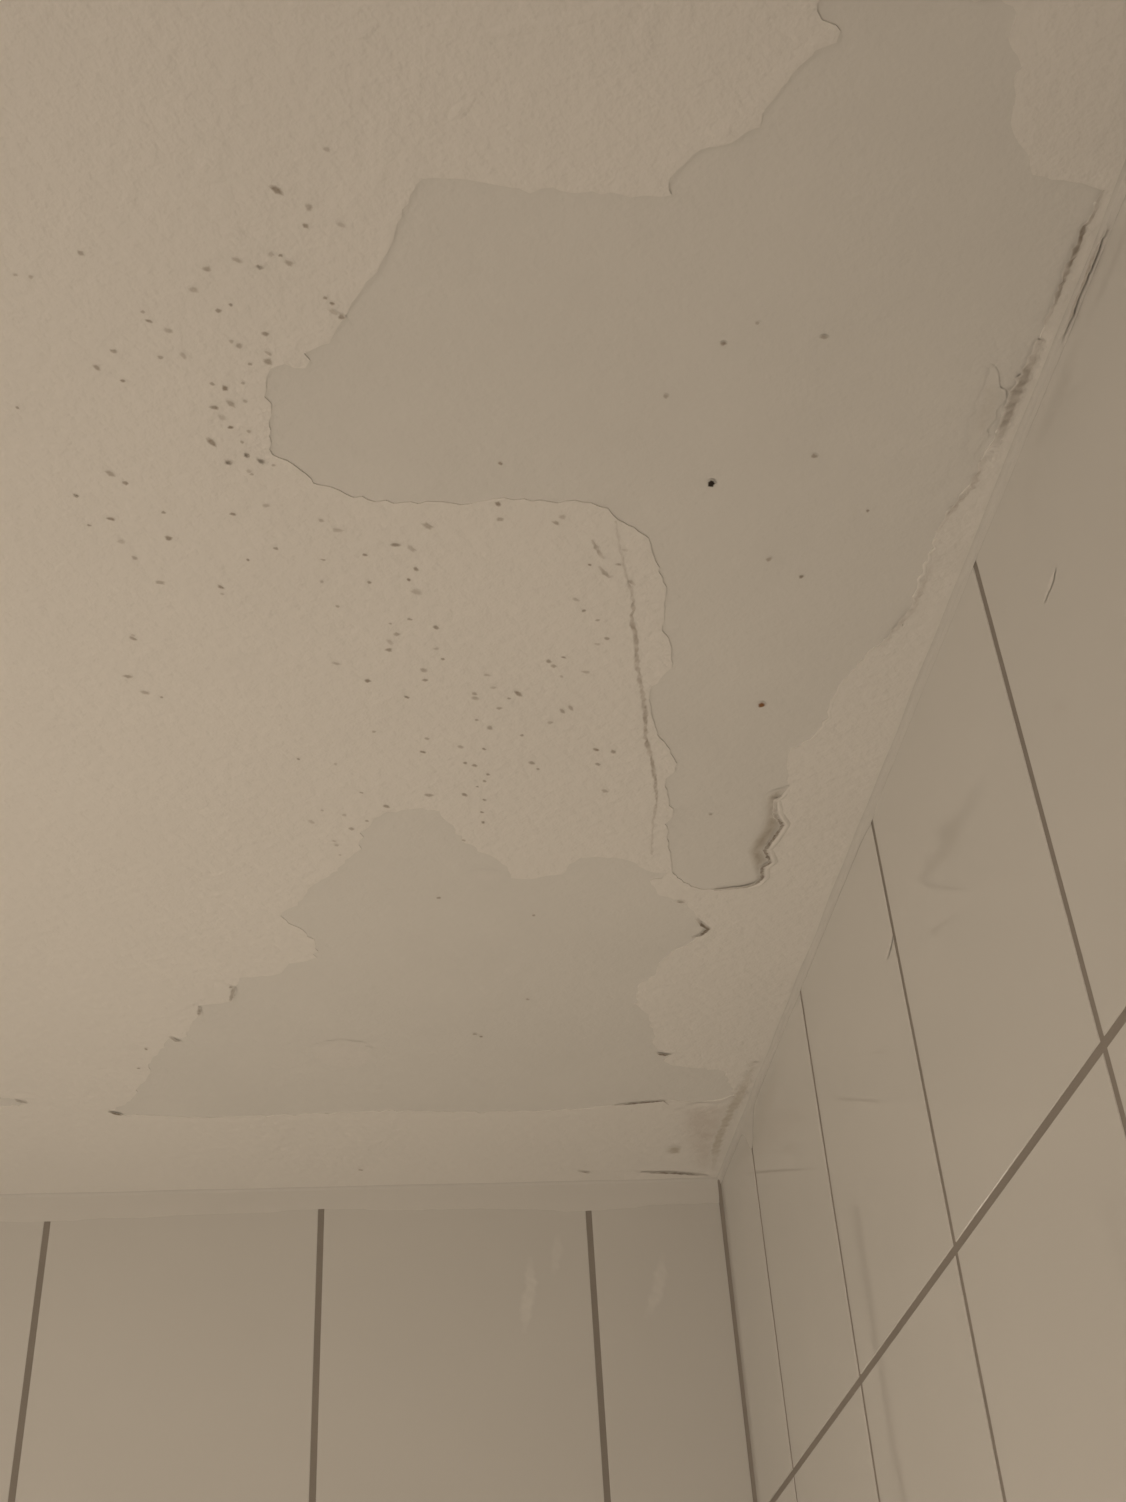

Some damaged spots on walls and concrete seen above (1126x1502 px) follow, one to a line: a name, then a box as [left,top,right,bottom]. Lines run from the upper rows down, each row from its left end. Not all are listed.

leakage [205,331,276,476]
crack [591,521,659,855]